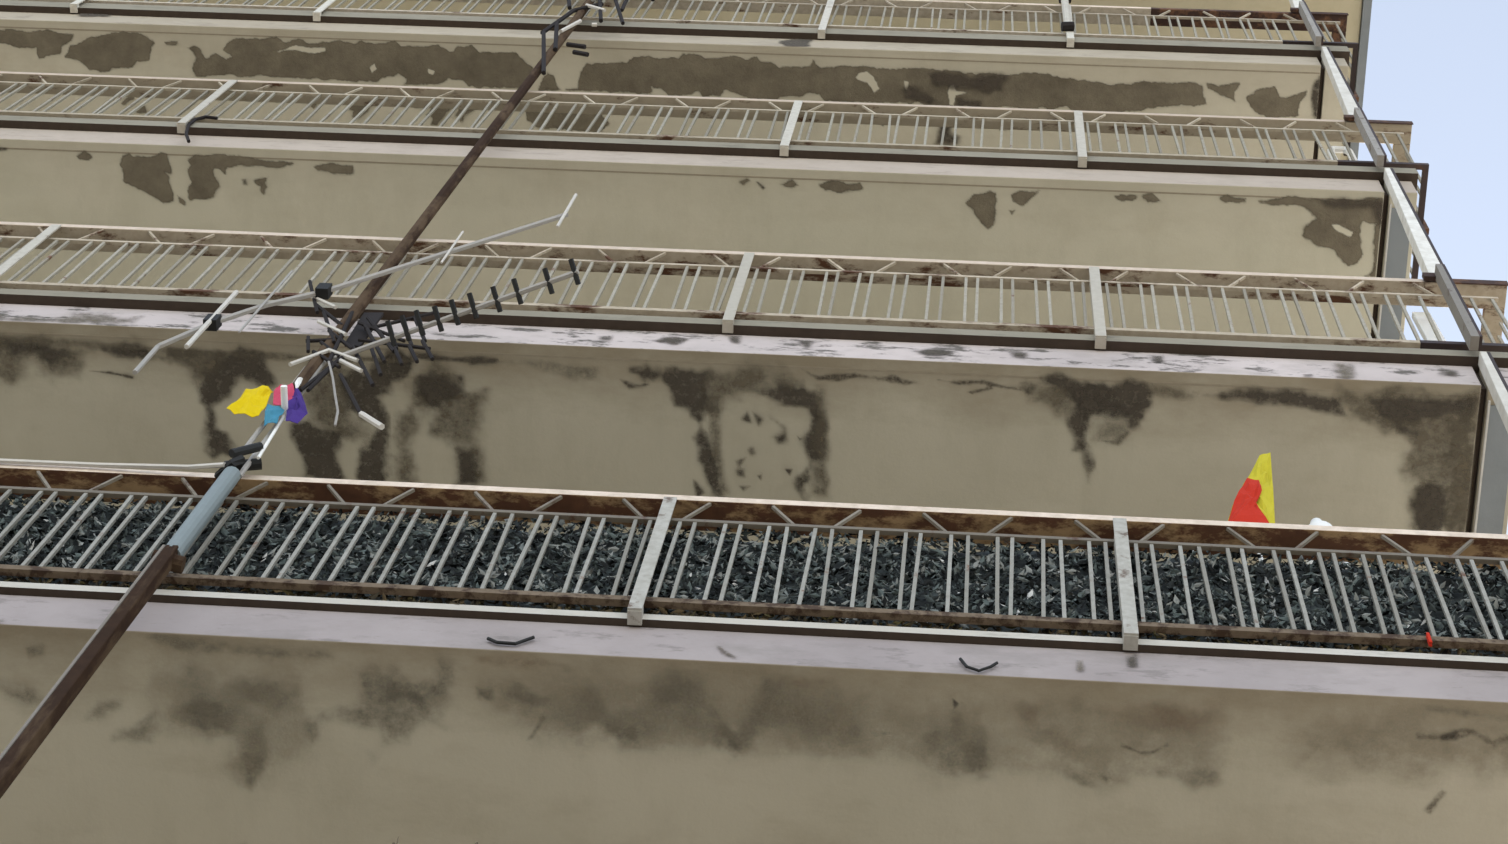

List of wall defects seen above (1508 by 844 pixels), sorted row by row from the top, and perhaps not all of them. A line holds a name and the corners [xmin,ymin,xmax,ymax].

spalling [0,29,1306,118]
spalling [427,108,473,125]
spalling [526,112,609,132]
spalling [937,127,958,145]
spalling [120,152,293,205]
spalling [966,191,1037,229]
spalling [1220,195,1383,277]
water stain [291,351,496,483]
water stain [624,367,854,497]
water stain [1025,374,1183,473]
water stain [1219,364,1478,532]
crack [1419,712,1508,744]